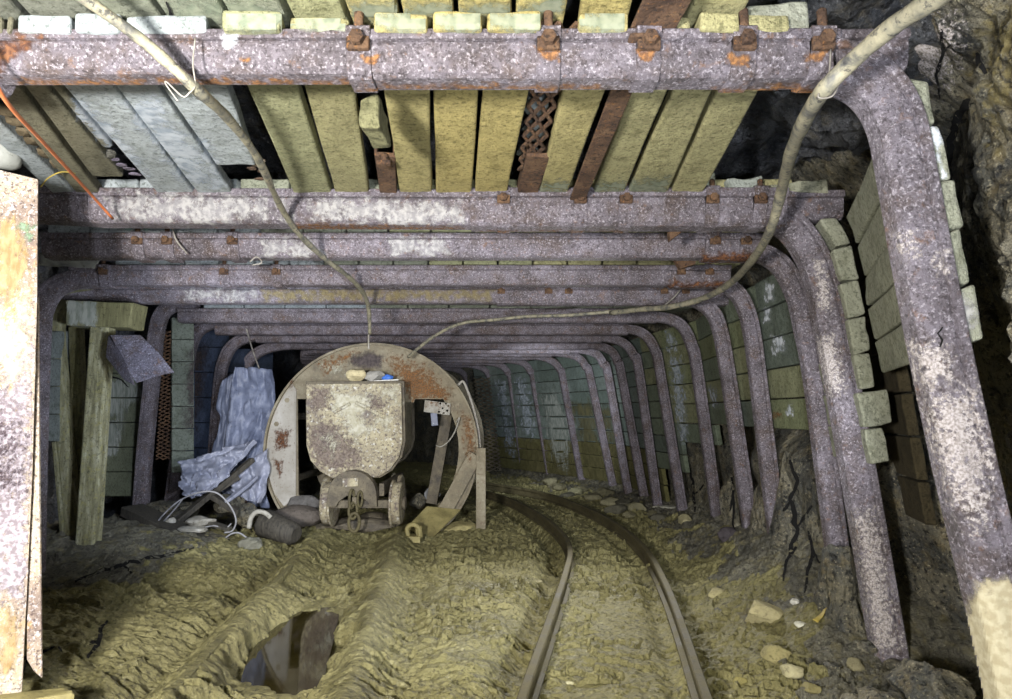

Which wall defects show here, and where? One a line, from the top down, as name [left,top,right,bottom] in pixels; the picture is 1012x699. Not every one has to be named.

rust [538,49,560,62]
rust [636,49,655,61]
rust [727,53,749,67]
rust [715,82,813,93]
crack [782,460,820,593]